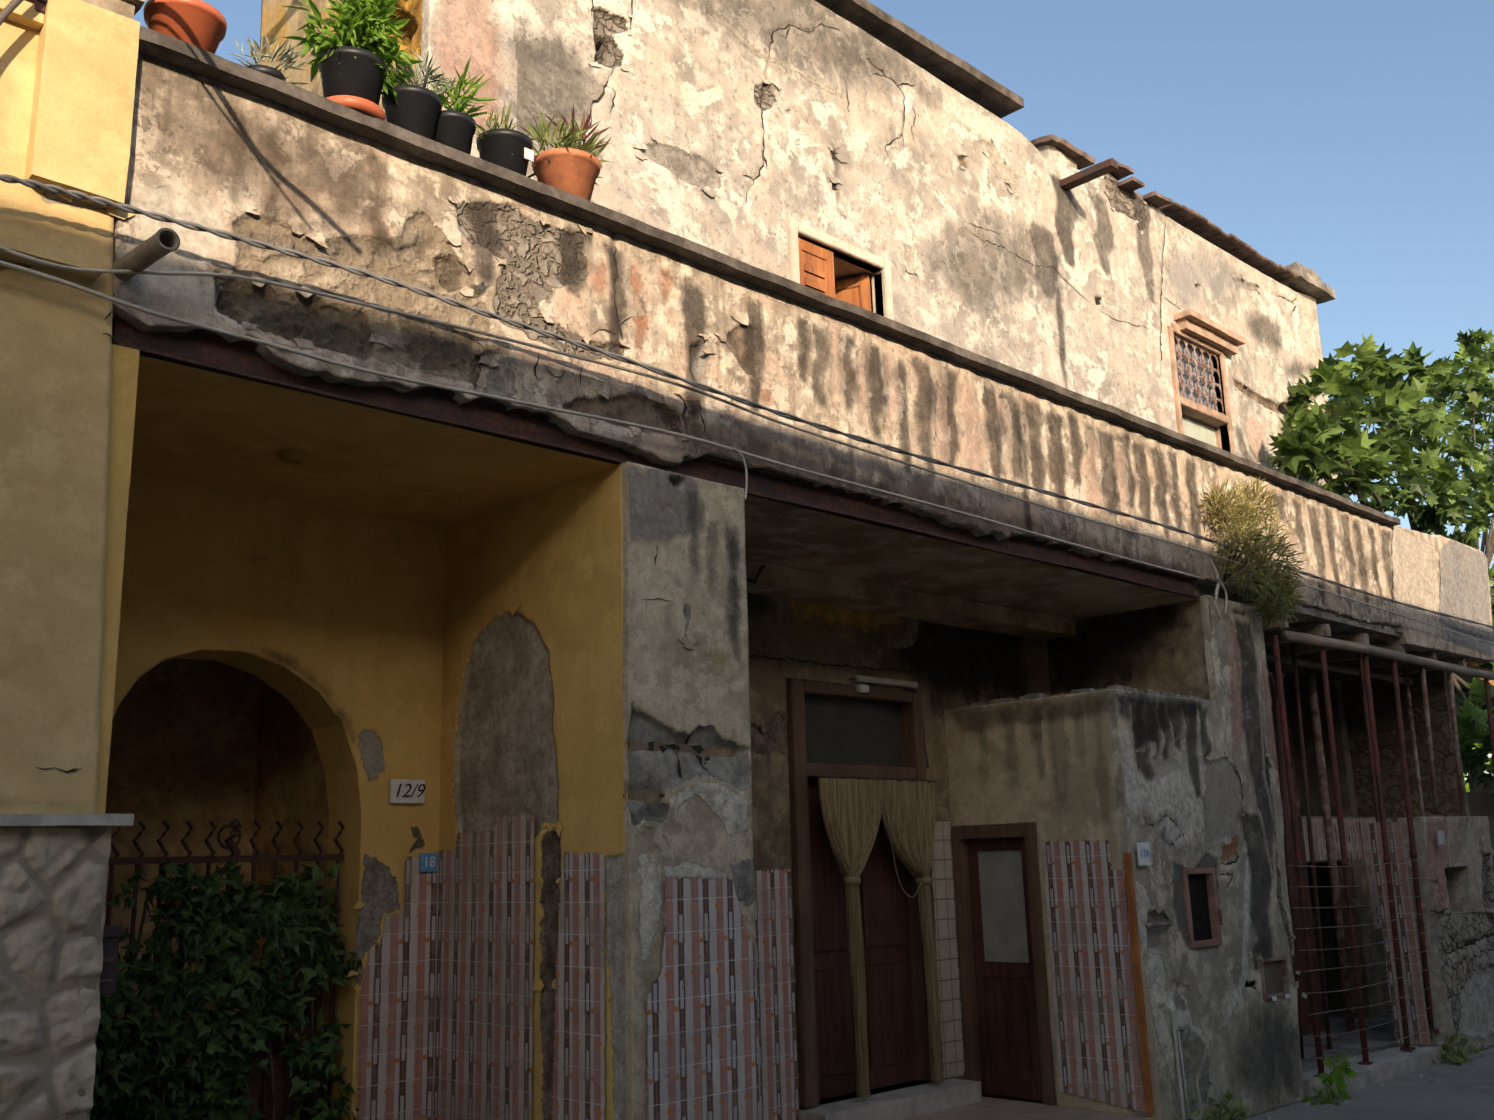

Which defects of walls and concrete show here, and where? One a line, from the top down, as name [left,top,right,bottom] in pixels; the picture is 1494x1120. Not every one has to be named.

spalling [385,0,423,67]
crack [588,68,616,127]
crack [743,23,840,203]
crack [846,58,917,158]
spalling [213,196,633,400]
damp [606,248,626,354]
damp [1033,176,1113,376]
damp [668,278,1199,573]
damp [1274,497,1393,604]
spalling [625,704,789,827]
spalling [446,601,564,1120]
spalling [1433,848,1494,1040]